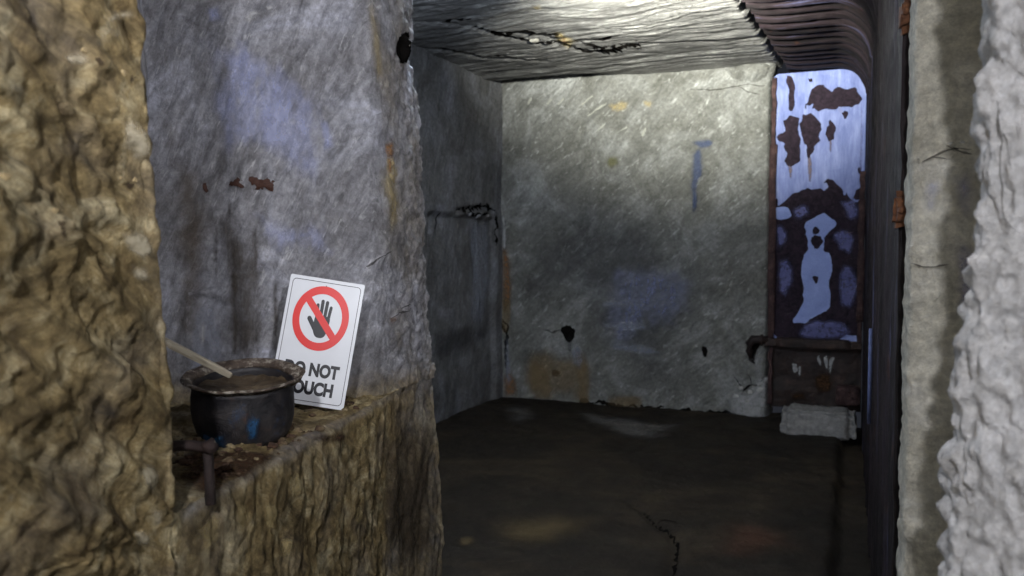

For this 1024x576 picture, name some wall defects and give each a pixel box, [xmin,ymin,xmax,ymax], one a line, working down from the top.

crack [441,18,642,59]
crack [630,506,680,576]